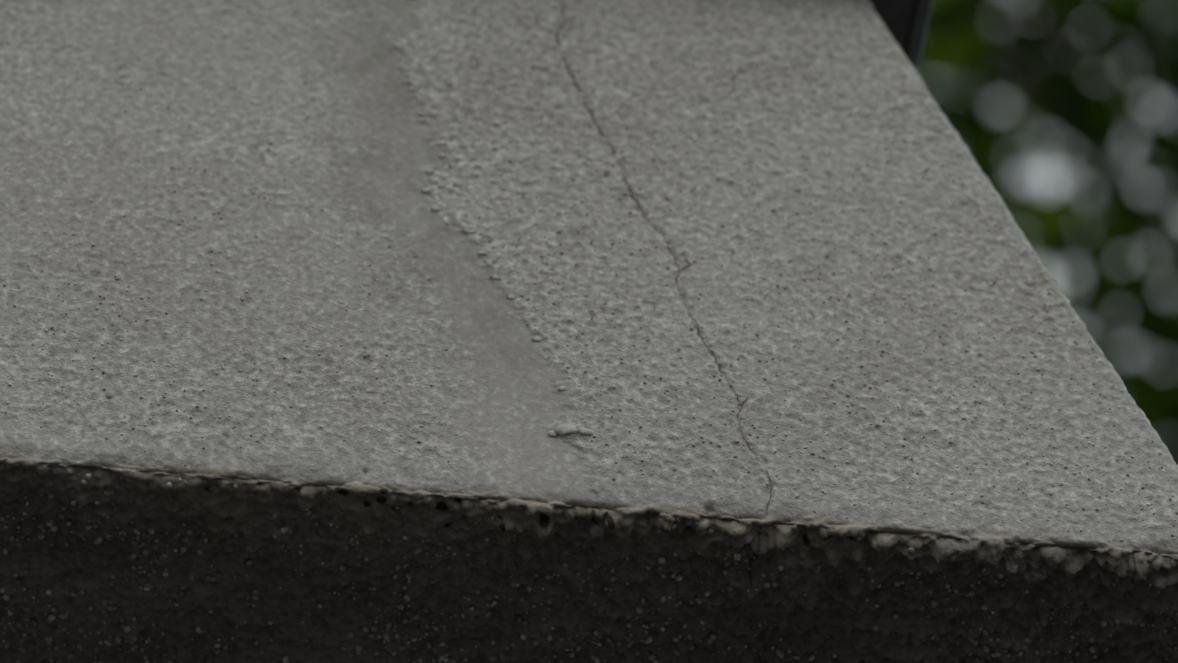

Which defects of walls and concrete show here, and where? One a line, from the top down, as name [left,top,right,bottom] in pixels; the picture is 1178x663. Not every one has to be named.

crack [536,8,603,136]
crack [625,181,722,373]
crack [737,397,773,583]